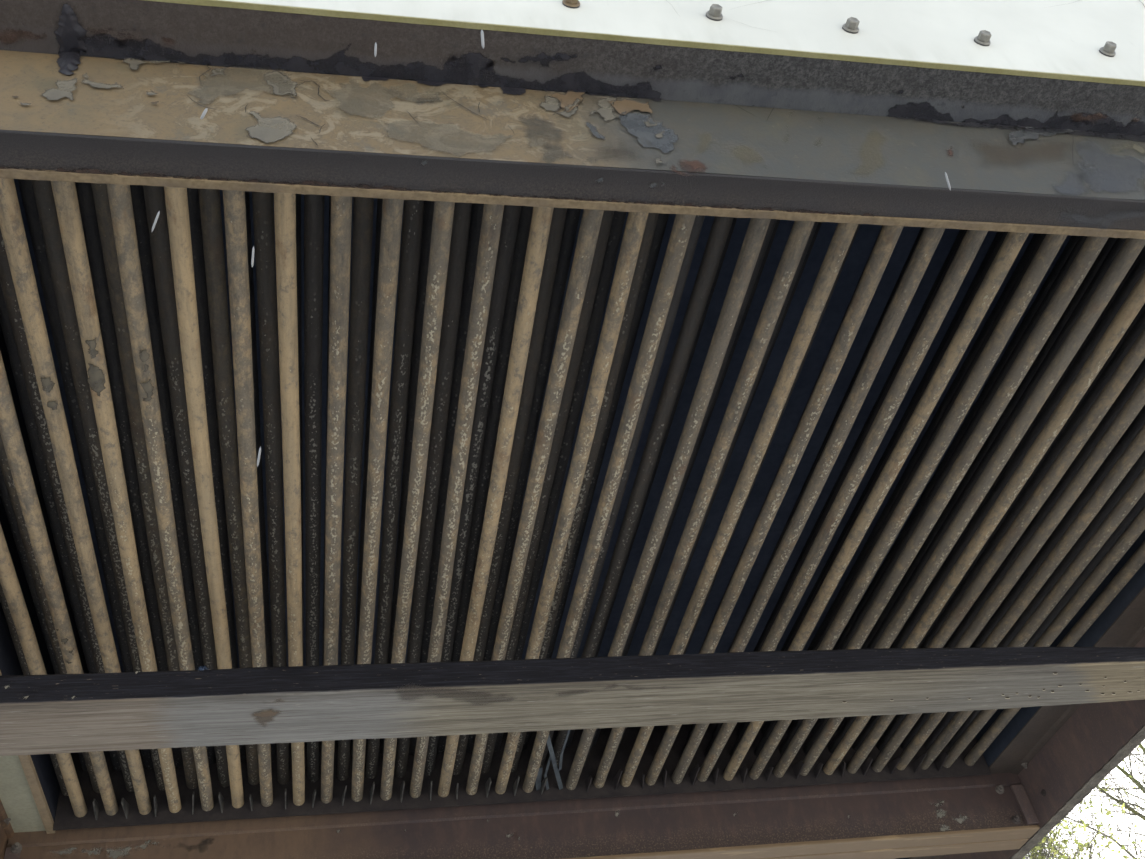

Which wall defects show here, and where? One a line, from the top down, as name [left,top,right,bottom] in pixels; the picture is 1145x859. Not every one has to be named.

peeling [246,111,297,143]
peeling [539,91,678,164]